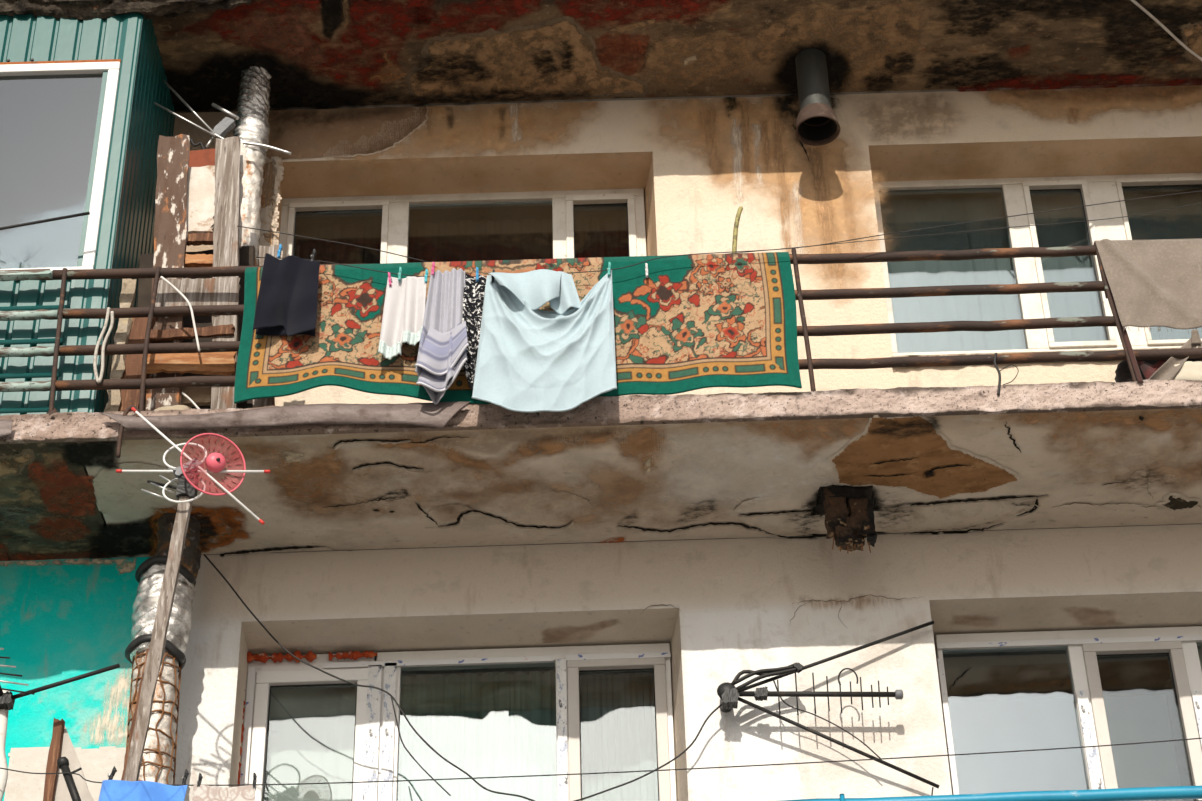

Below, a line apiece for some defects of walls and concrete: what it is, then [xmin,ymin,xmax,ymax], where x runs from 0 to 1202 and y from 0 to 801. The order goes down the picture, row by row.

spalling [404,16,649,107]
spalling [756,0,923,91]
peeling [958,20,1202,92]
water stain [988,85,1202,123]
water stain [654,96,876,286]
water stain [236,445,386,515]
crack [333,436,469,472]
crack [416,490,594,530]
water stain [377,427,664,523]
crack [617,497,816,539]
spalling [828,415,1022,500]
crack [884,469,1165,535]